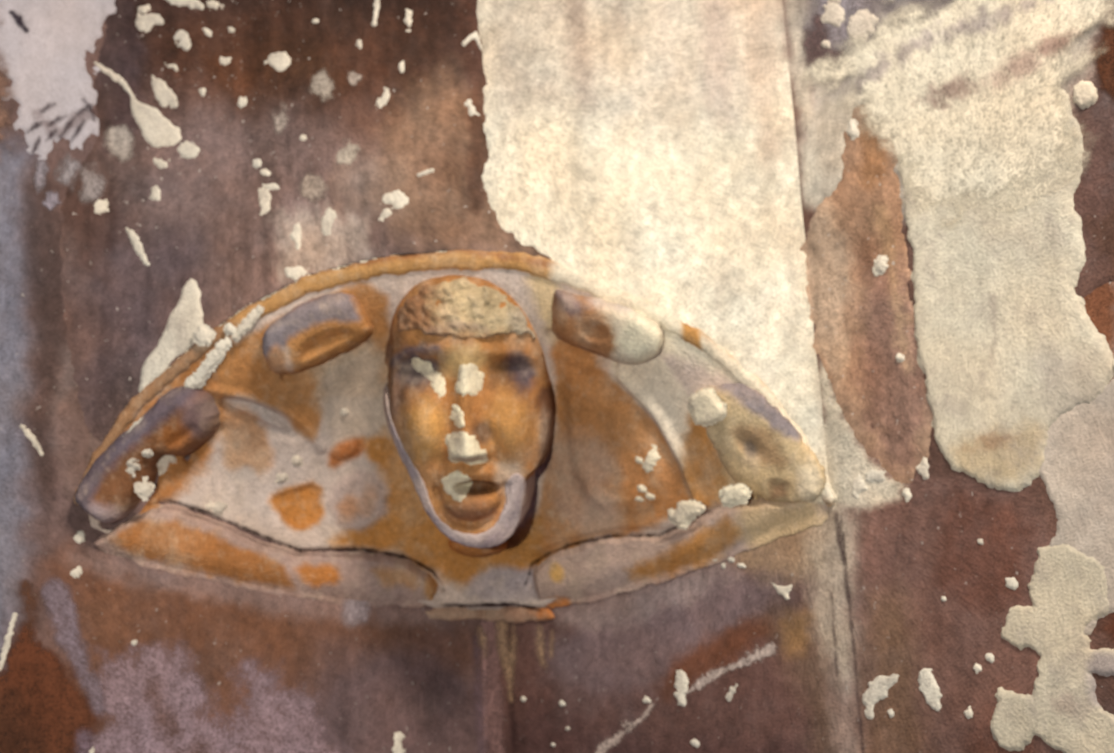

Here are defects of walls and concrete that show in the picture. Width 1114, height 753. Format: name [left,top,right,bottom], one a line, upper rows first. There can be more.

corrosion [1092,25,1114,97]
peeling [0,0,551,441]
peeling [800,0,1114,753]
peeling [20,424,44,456]
peeling [125,449,177,501]
peeling [635,444,661,502]
peeling [667,499,706,530]
peeling [719,483,752,508]
damp [344,599,368,624]
peeling [0,613,18,671]
corrosion [0,580,97,753]
damp [42,581,339,753]